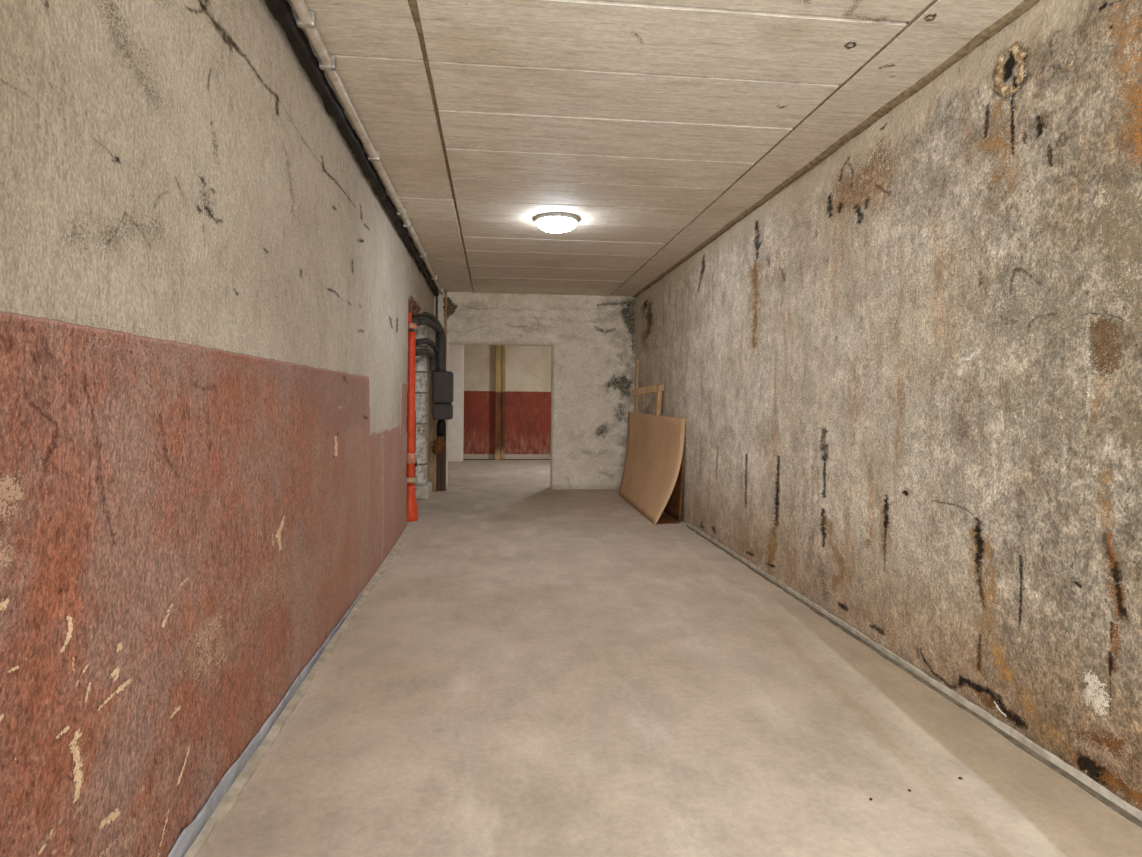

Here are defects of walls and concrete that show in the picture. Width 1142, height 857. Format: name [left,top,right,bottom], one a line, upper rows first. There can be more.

crack [187,0,279,115]
damp [580,298,653,479]
damp [957,162,1142,545]
peeling [0,470,28,521]